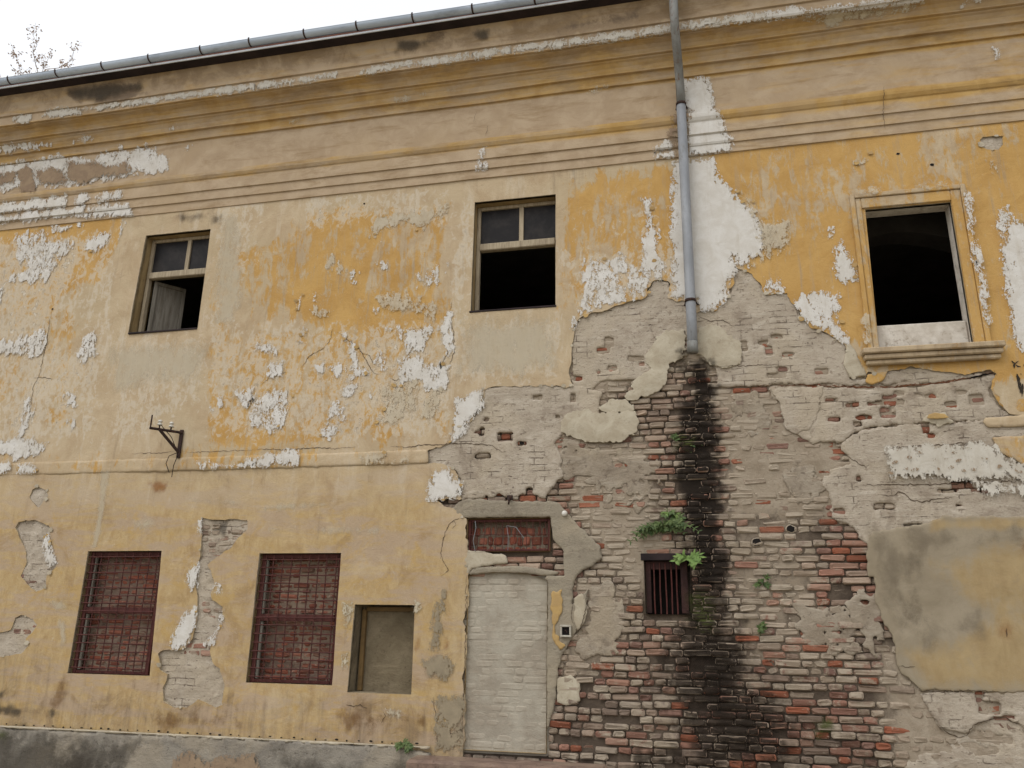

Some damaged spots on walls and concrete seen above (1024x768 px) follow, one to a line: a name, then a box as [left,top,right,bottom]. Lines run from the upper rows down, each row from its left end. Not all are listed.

damp [70,85,140,99]
peeling [0,134,170,303]
peeling [0,328,47,358]
peeling [0,397,49,507]
peeling [76,331,101,366]
peeling [209,342,294,434]
flaking render [313,76,1024,768]
flaking render [17,520,58,591]
damp [634,363,794,768]
flaking render [0,615,37,657]
flaking render [156,518,248,709]